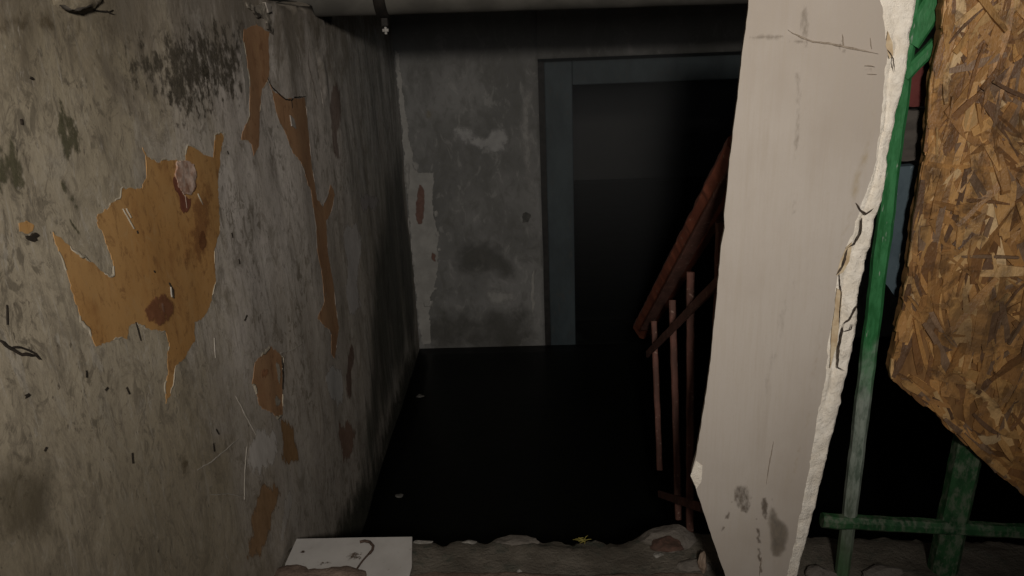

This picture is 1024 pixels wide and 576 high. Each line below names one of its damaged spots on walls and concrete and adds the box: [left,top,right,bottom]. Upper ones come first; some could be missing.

water stain [130,19,242,119]
crack [0,305,41,360]
peeling [53,132,233,402]
peeling [241,2,362,358]
peeling [247,346,299,559]